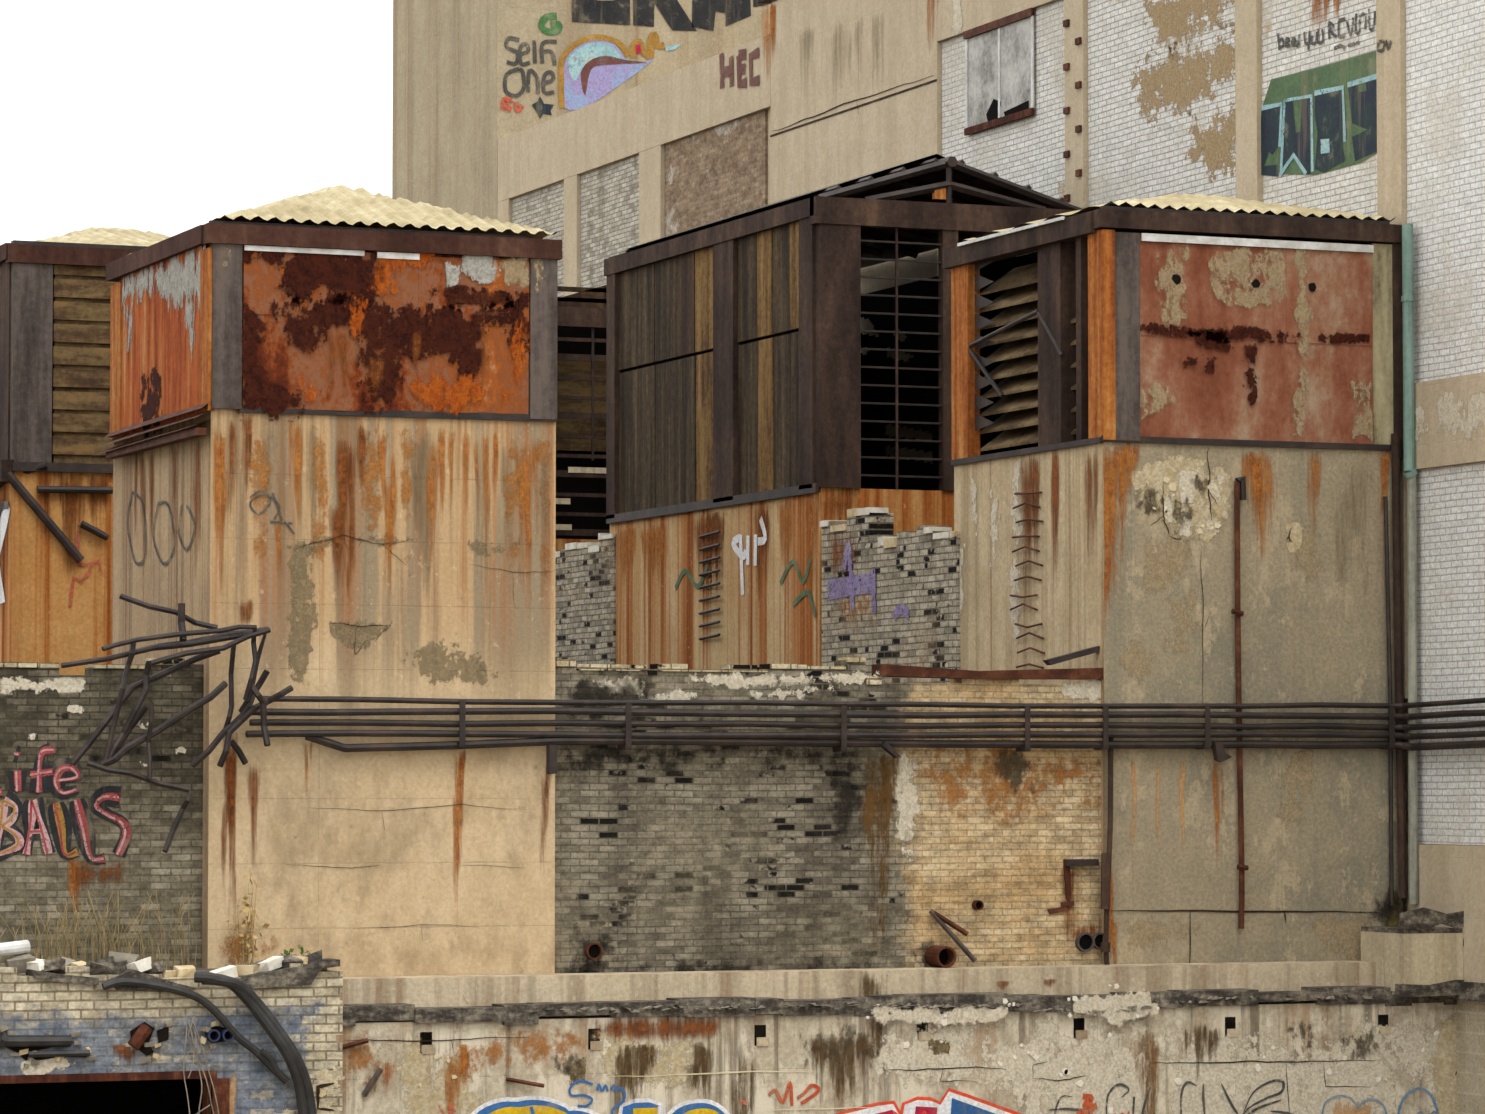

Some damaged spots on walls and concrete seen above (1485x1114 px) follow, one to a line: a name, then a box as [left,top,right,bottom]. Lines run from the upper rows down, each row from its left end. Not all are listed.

peeling [1131,0,1236,183]
rust [135,366,163,522]
rust [193,245,551,573]
rust [1086,233,1389,601]
rust [1021,452,1059,559]
peeling [1128,454,1233,543]
spalling [286,532,417,682]
spalling [403,641,498,685]
water stain [615,1045,657,1098]
water stain [687,1043,712,1088]
water stain [732,1055,754,1114]
water stain [800,1020,882,1096]